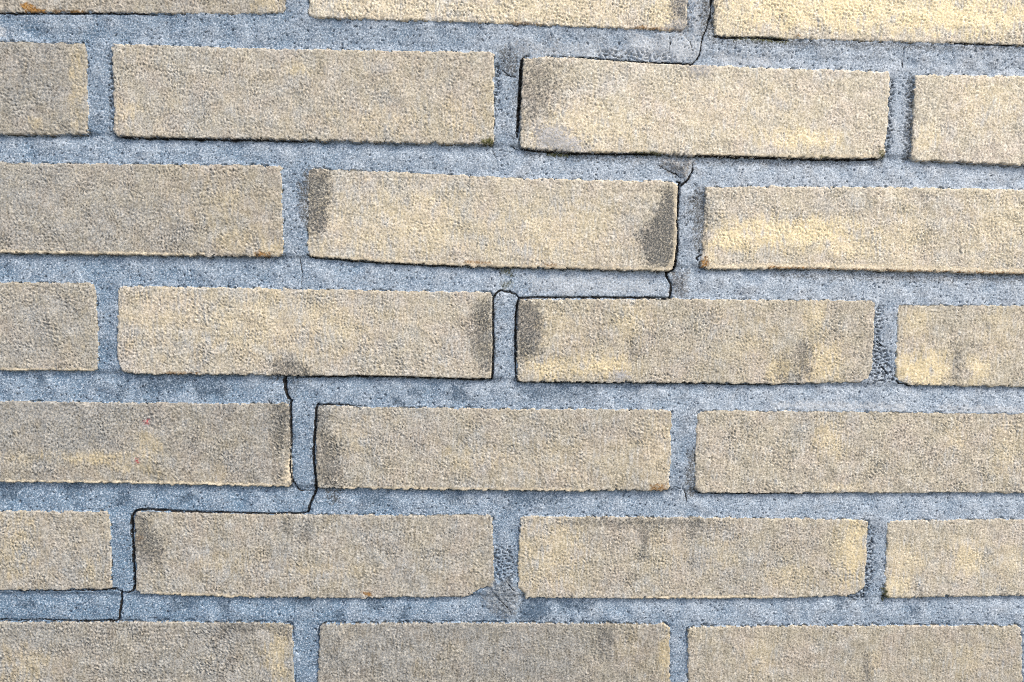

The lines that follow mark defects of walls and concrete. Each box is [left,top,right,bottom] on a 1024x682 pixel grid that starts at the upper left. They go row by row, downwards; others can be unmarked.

crack [559,0,713,65]
crack [492,55,527,155]
crack [1,164,693,622]